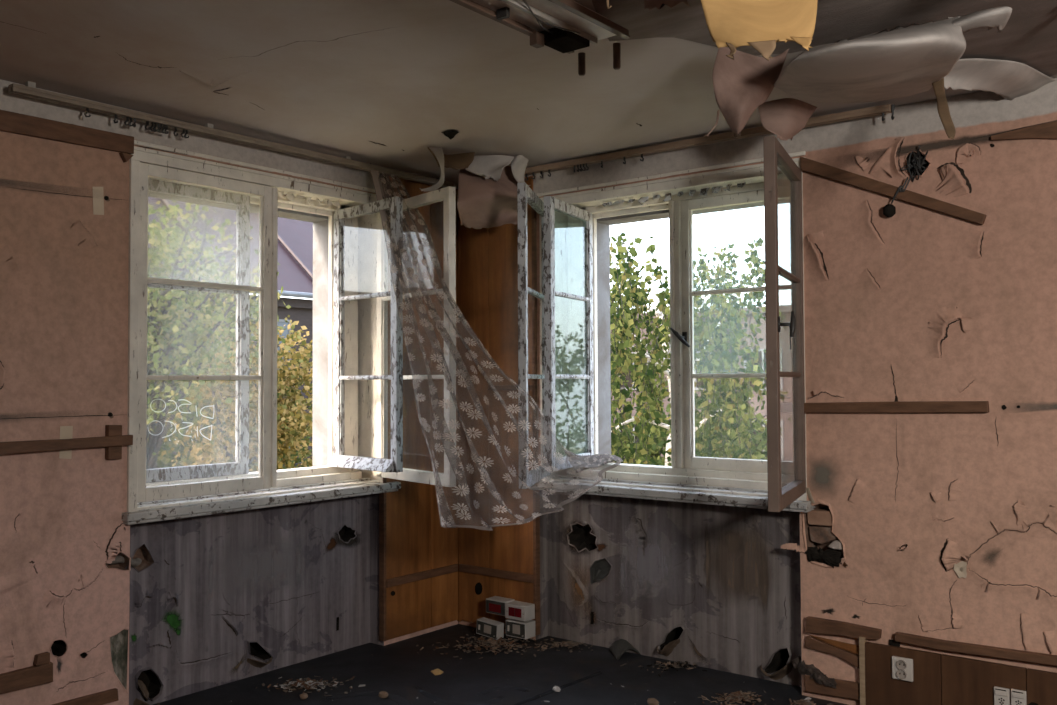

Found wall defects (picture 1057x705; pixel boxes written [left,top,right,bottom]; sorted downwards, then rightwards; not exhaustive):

peeling [855,137,981,217]
peeling [925,305,976,358]
spalling [567,522,612,585]
spalling [802,488,846,568]
crack [853,500,1057,632]
flaking render [109,627,164,705]
spalling [223,613,274,668]
spalling [656,625,685,656]